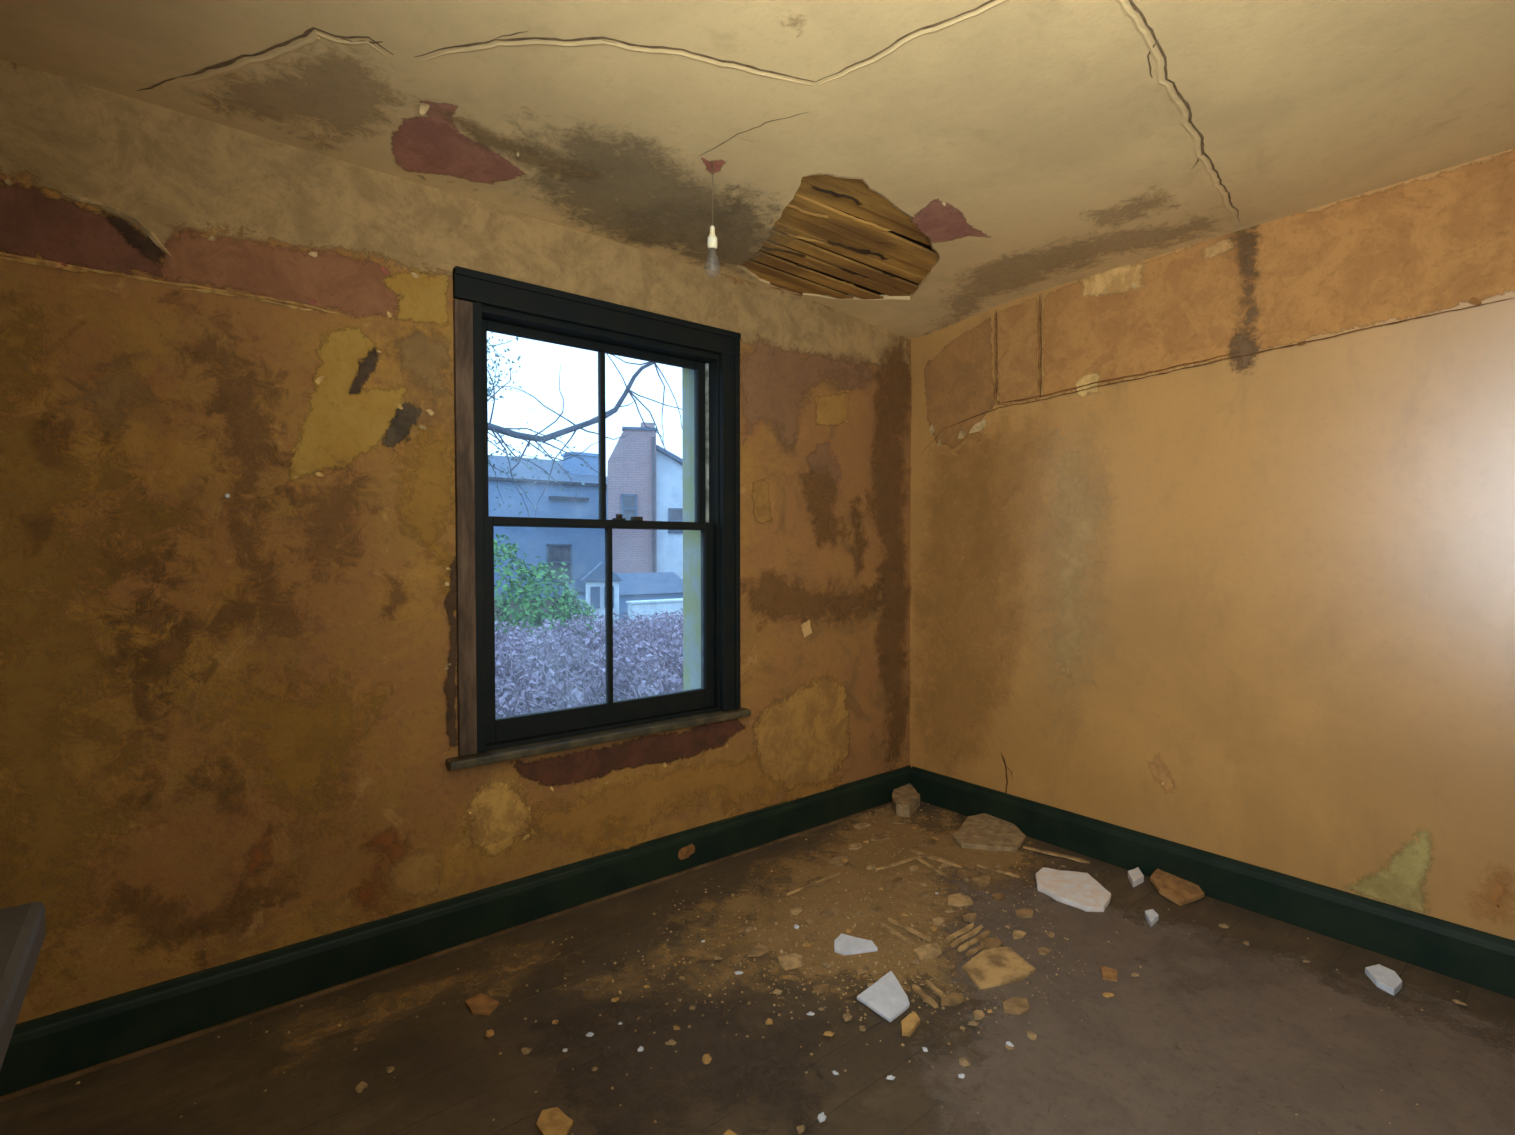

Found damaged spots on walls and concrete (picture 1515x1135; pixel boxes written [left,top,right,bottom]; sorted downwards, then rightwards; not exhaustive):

damp [207,56,401,146]
peeling [0,59,990,488]
crack [137,0,1008,159]
damp [524,128,778,273]
crack [1115,0,1240,223]
damp [110,322,377,729]
damp [740,336,911,770]
spalling [511,718,745,791]